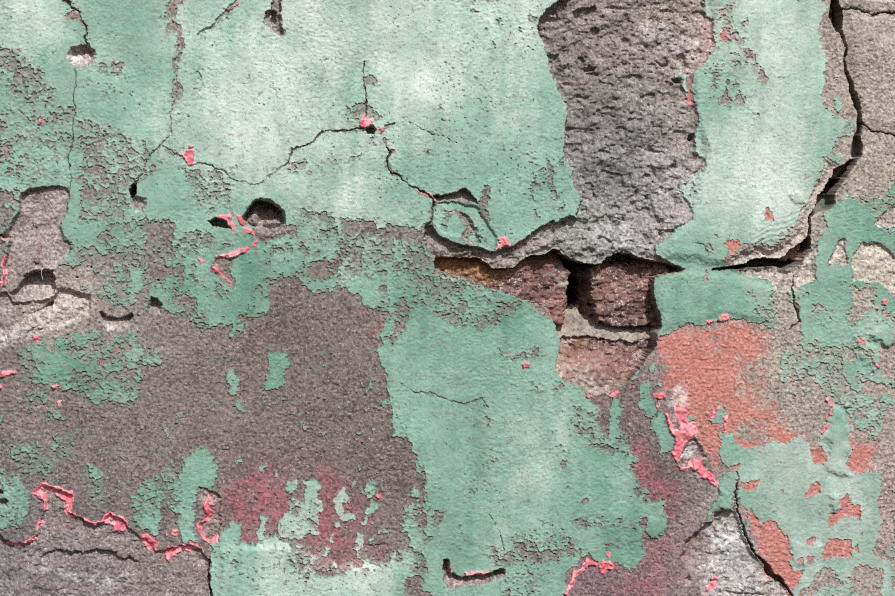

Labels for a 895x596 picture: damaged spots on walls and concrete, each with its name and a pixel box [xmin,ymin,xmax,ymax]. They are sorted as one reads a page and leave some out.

peeling [166,0,186,100]
flaking render [263,0,286,37]
crack [133,0,478,238]
crack [695,0,895,330]
peeling [0,44,432,596]
flaking render [424,0,895,596]
crack [734,471,793,596]